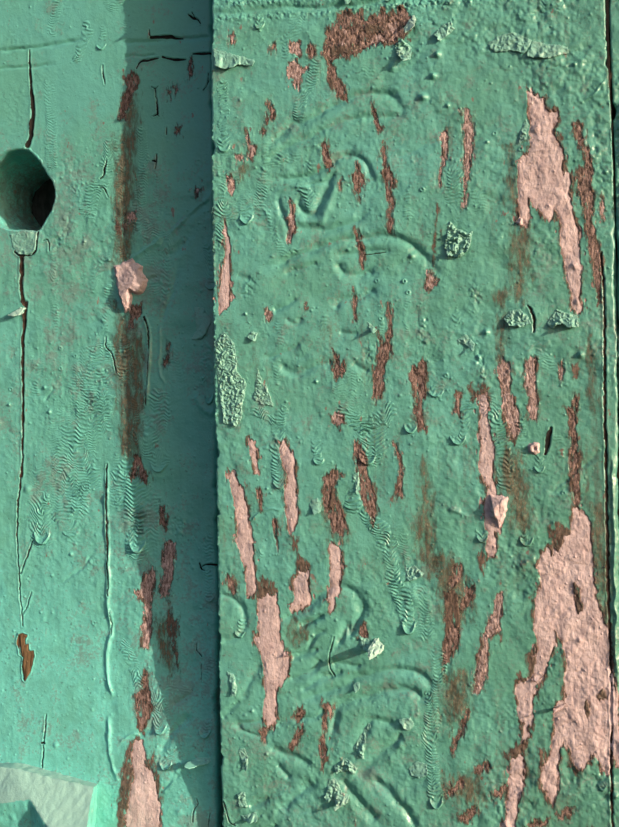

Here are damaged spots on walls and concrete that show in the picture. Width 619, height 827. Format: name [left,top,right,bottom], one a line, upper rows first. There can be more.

crack [25,50,35,150]
crack [136,30,212,90]
peeling [287,0,416,103]
peeling [513,84,606,328]
crack [14,232,50,626]
peeling [452,381,504,576]
peeling [497,356,540,447]
crack [600,252,613,691]
peeling [222,434,378,743]
peeling [491,394,619,827]
peeling [116,669,163,827]
crack [607,726,615,827]